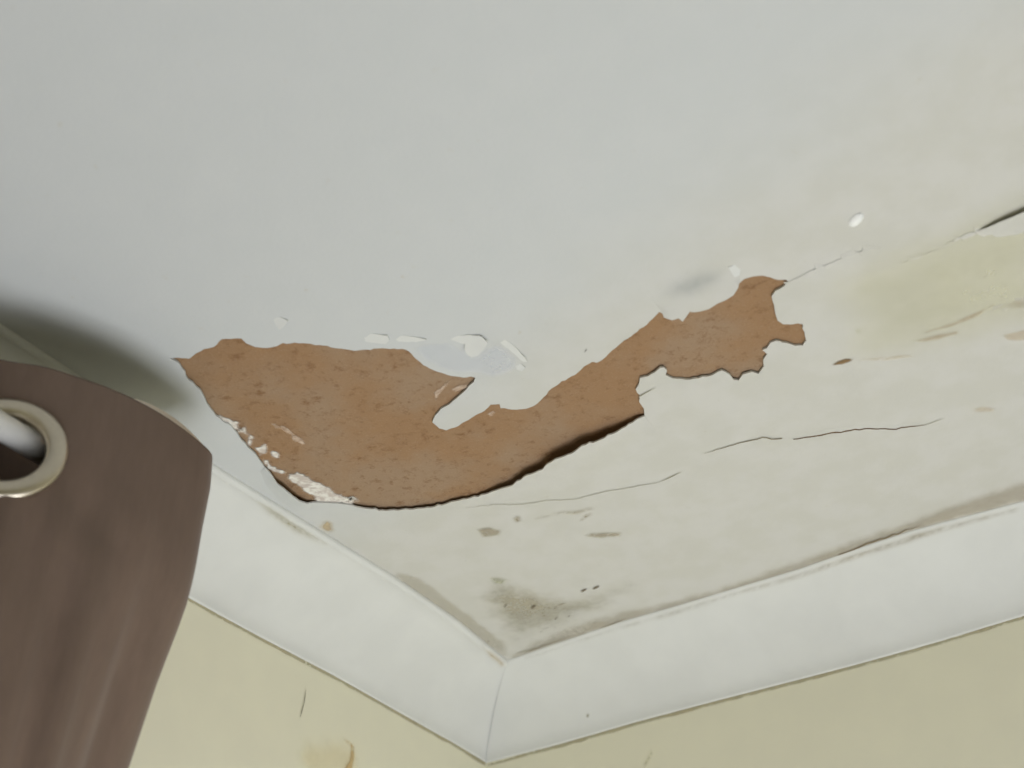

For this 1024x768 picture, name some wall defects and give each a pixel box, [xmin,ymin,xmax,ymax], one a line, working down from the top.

peeling [901,212,1024,264]
peeling [174,245,882,510]
crack [708,418,944,453]